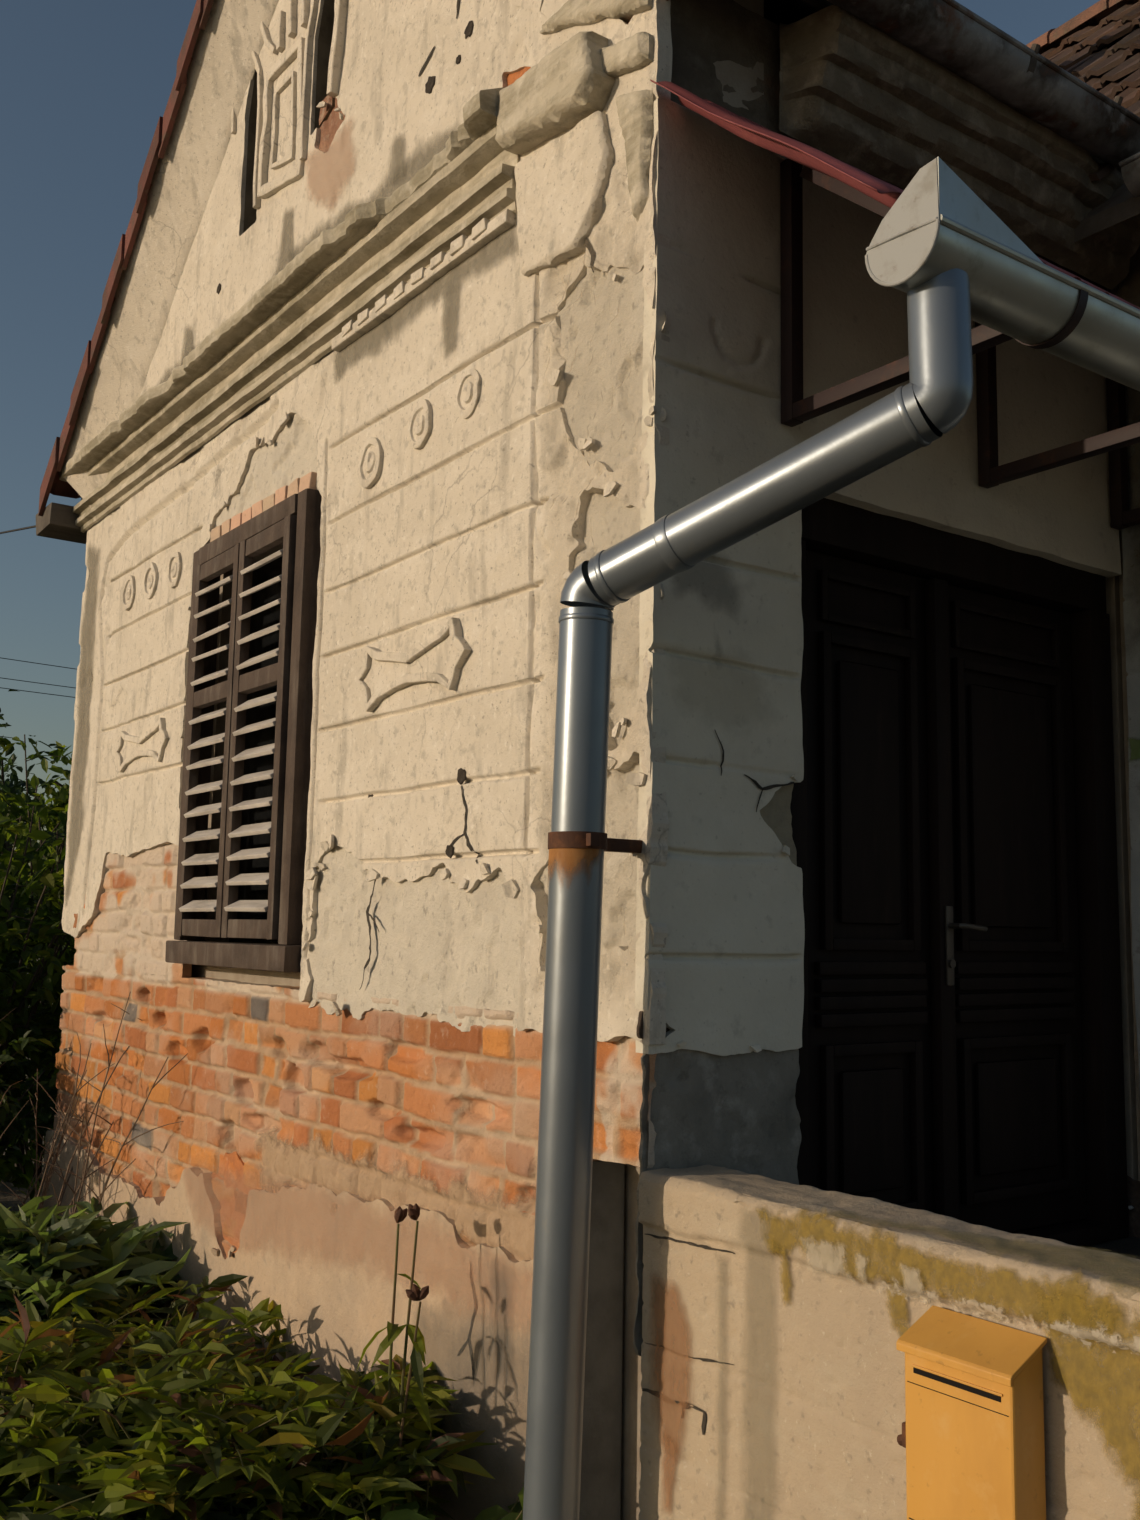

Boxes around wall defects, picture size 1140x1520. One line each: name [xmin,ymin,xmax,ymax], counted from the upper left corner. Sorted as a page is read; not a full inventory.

leakage [370,134,450,202]
leakage [277,208,352,270]
leakage [160,330,192,384]
crack [715,730,794,812]
crack [450,786,481,863]
rust [548,848,600,879]
spalling [760,774,799,866]
flaking render [53,834,543,1257]
leakage [807,1243,1140,1353]
rust [652,1282,689,1510]